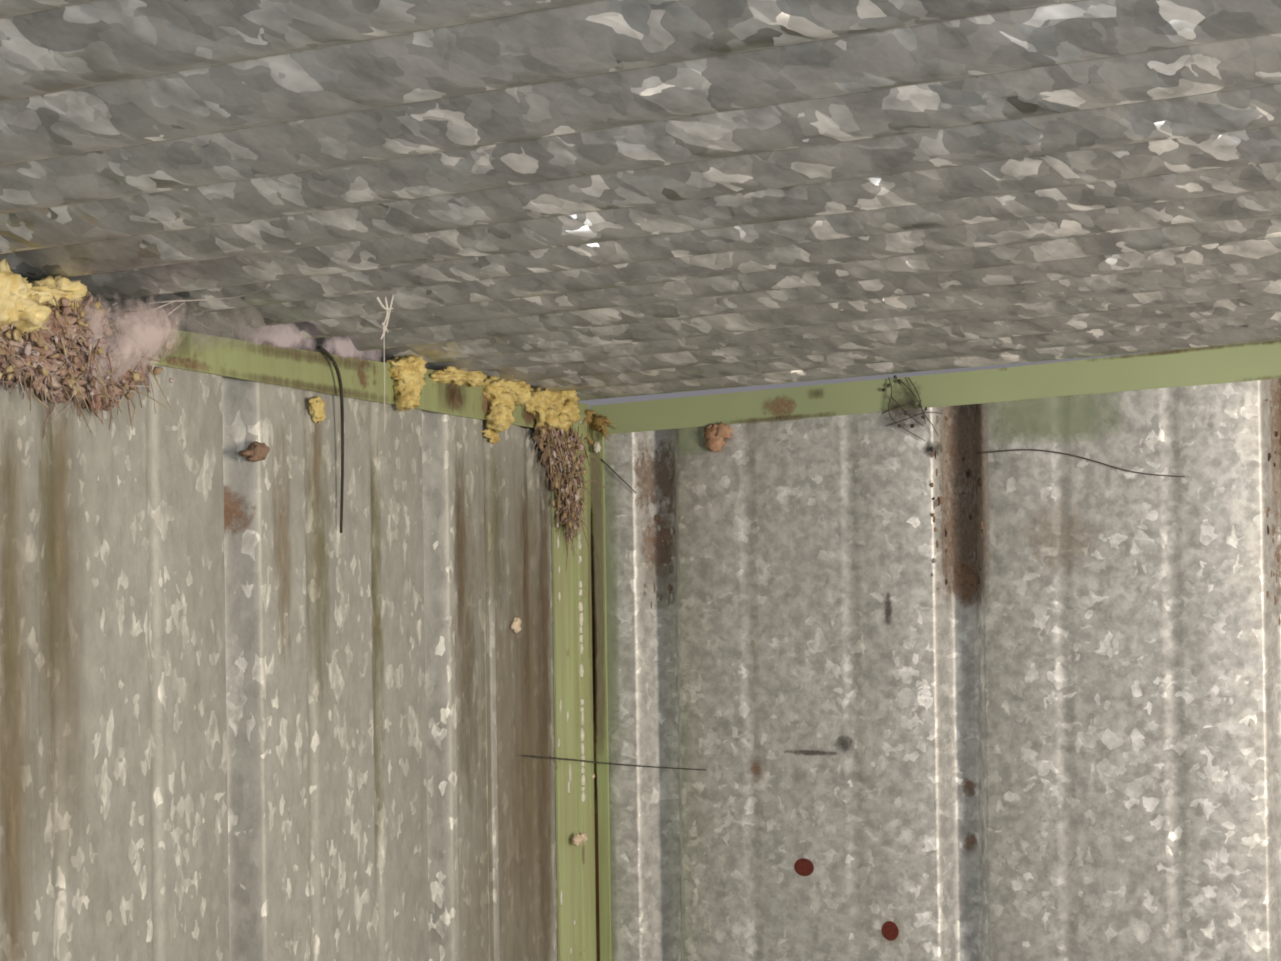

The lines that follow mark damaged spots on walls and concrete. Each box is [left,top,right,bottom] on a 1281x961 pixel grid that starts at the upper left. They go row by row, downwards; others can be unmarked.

rust [224,487,248,532]
rust [635,443,675,609]
rust [929,403,989,603]
rust [1265,378,1281,626]